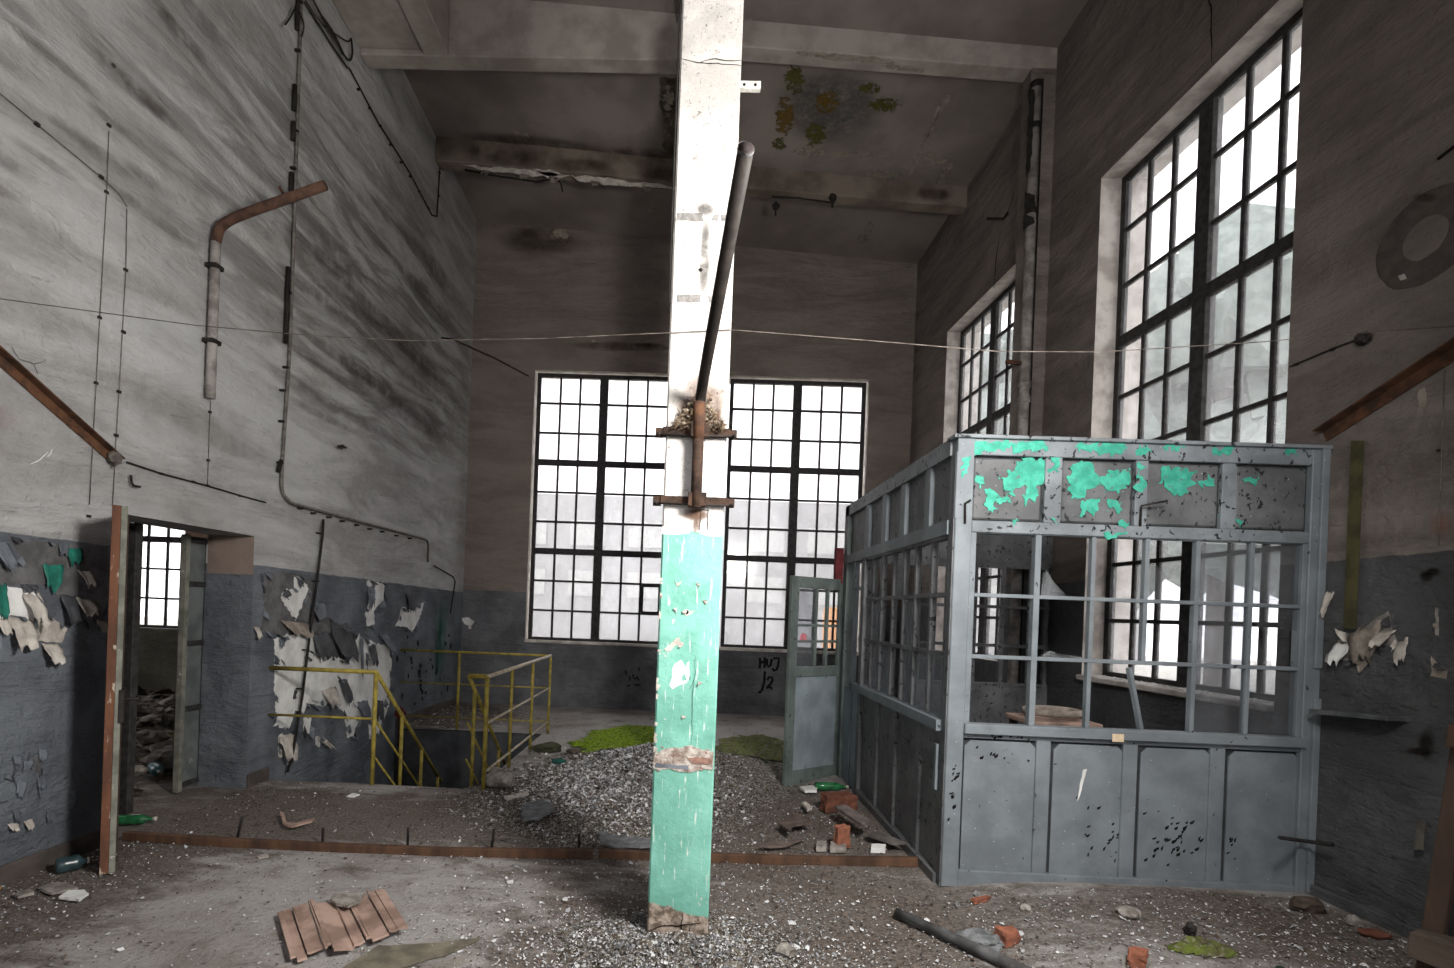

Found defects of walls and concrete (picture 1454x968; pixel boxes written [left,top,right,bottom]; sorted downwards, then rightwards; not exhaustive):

damp [772,51,923,179]
spalling [461,164,675,192]
peeling [0,536,109,665]
peeling [254,571,542,789]
peeling [656,637,702,699]
peeling [659,578,707,619]
peeling [1318,591,1408,674]
spalling [652,722,714,773]